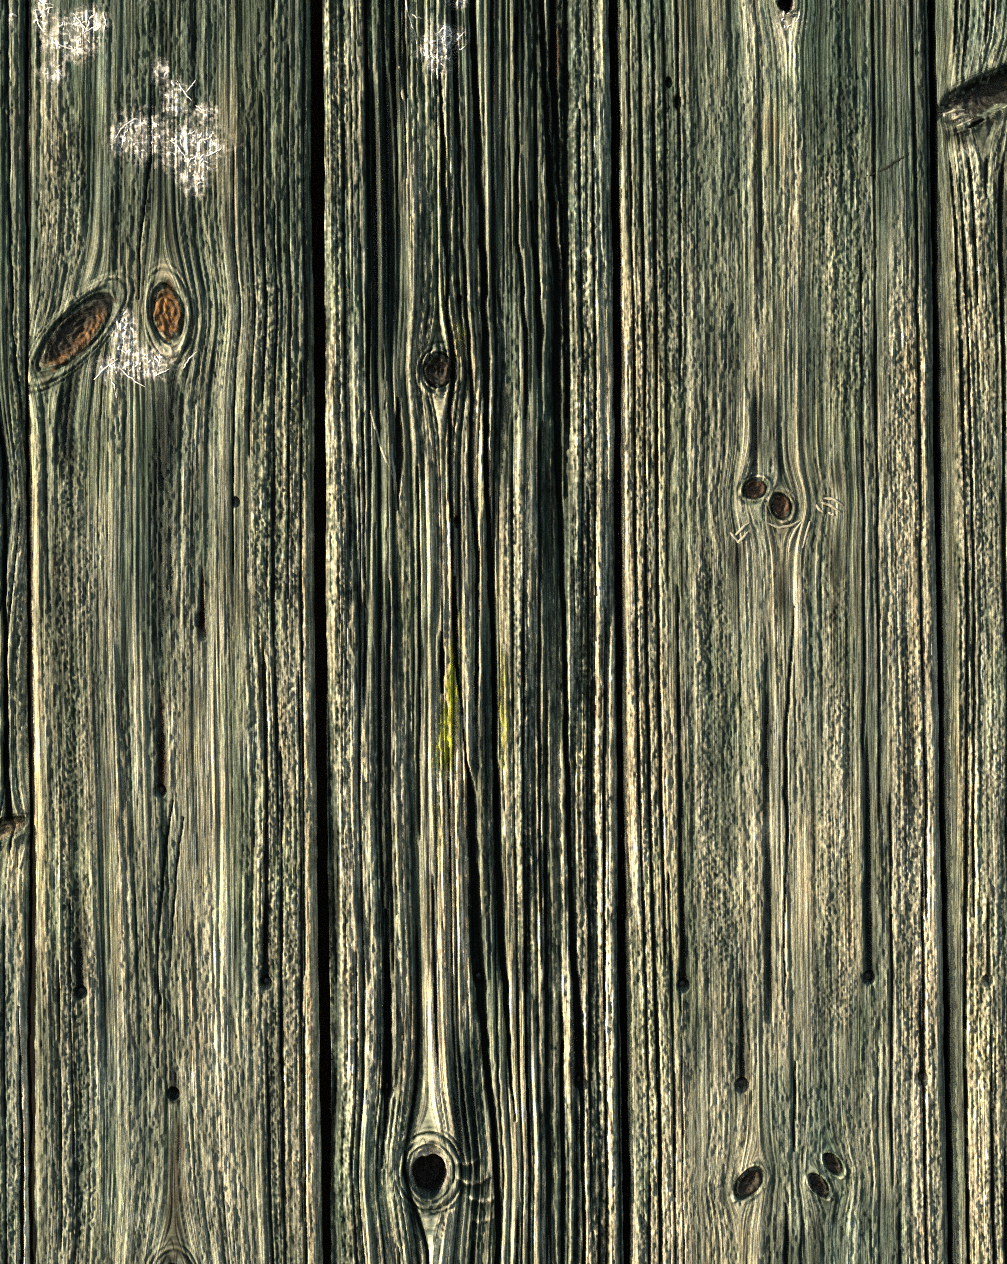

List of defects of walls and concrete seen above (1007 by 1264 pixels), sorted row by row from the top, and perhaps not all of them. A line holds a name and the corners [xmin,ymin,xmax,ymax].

crack [860,0,1007,1264]